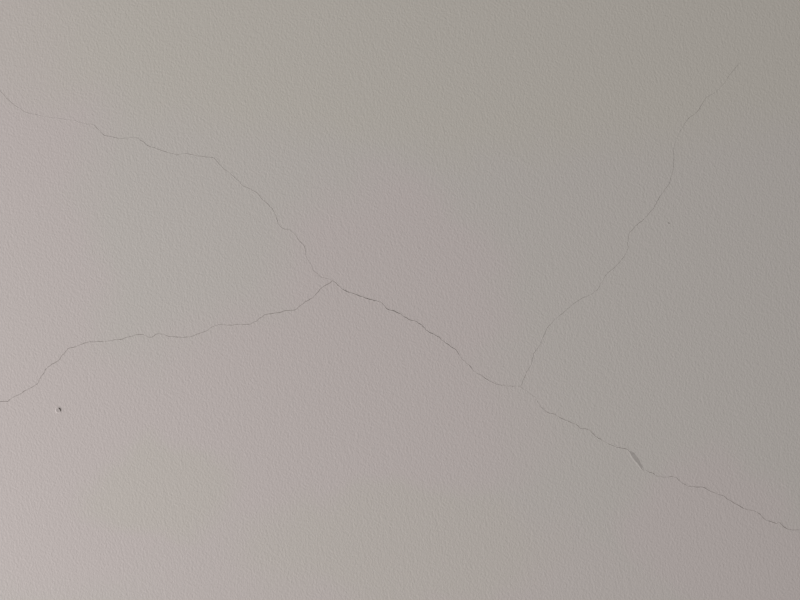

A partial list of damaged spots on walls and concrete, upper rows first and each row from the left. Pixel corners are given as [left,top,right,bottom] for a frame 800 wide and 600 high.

crack [0,62,800,531]